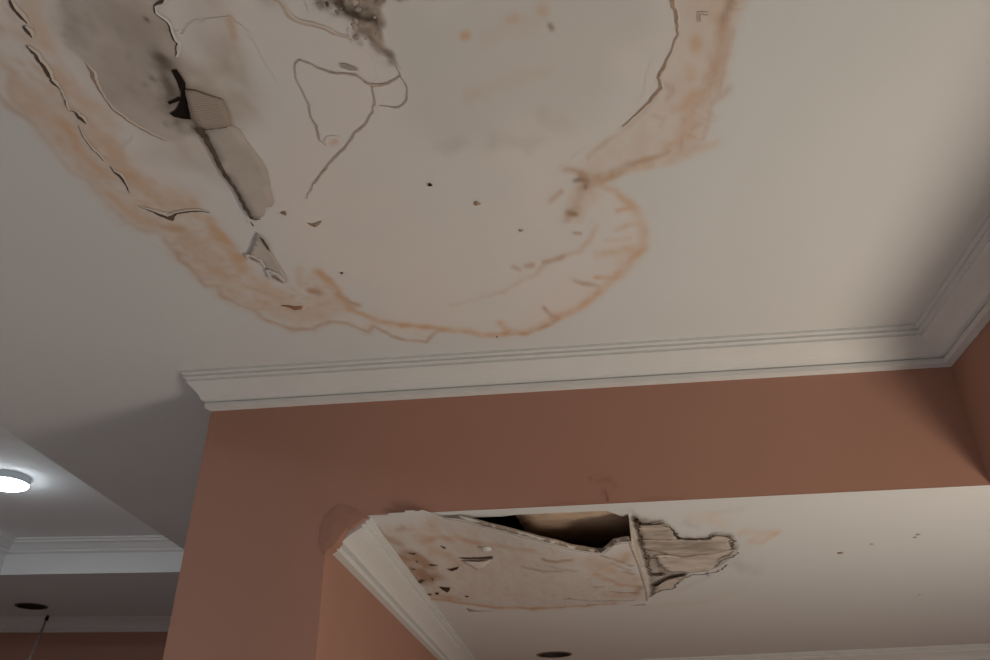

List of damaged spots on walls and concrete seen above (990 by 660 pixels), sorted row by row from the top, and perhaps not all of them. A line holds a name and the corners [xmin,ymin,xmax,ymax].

crack [8,0,210,221]
peeling [20,0,281,218]
peeling [246,232,287,285]
crack [273,0,408,199]
leakage [0,0,761,351]
crack [622,0,709,128]
peeling [628,508,742,598]